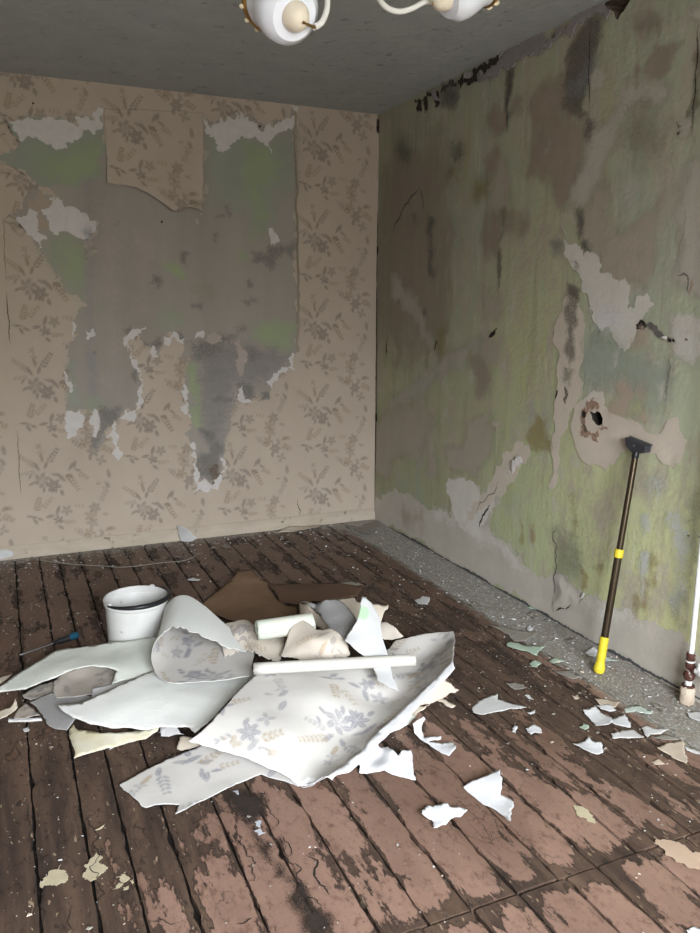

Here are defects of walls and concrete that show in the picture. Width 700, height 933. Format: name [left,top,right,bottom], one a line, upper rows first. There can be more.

water stain [503,66,516,131]
spalling [414,0,630,113]
water stain [559,14,606,148]
peeling [104,108,204,211]
water stain [176,324,294,484]
crack [372,403,380,471]
crack [376,188,424,377]
crack [462,441,530,528]
peeling [548,227,688,490]
flaking render [669,310,700,367]
spalling [374,396,700,703]